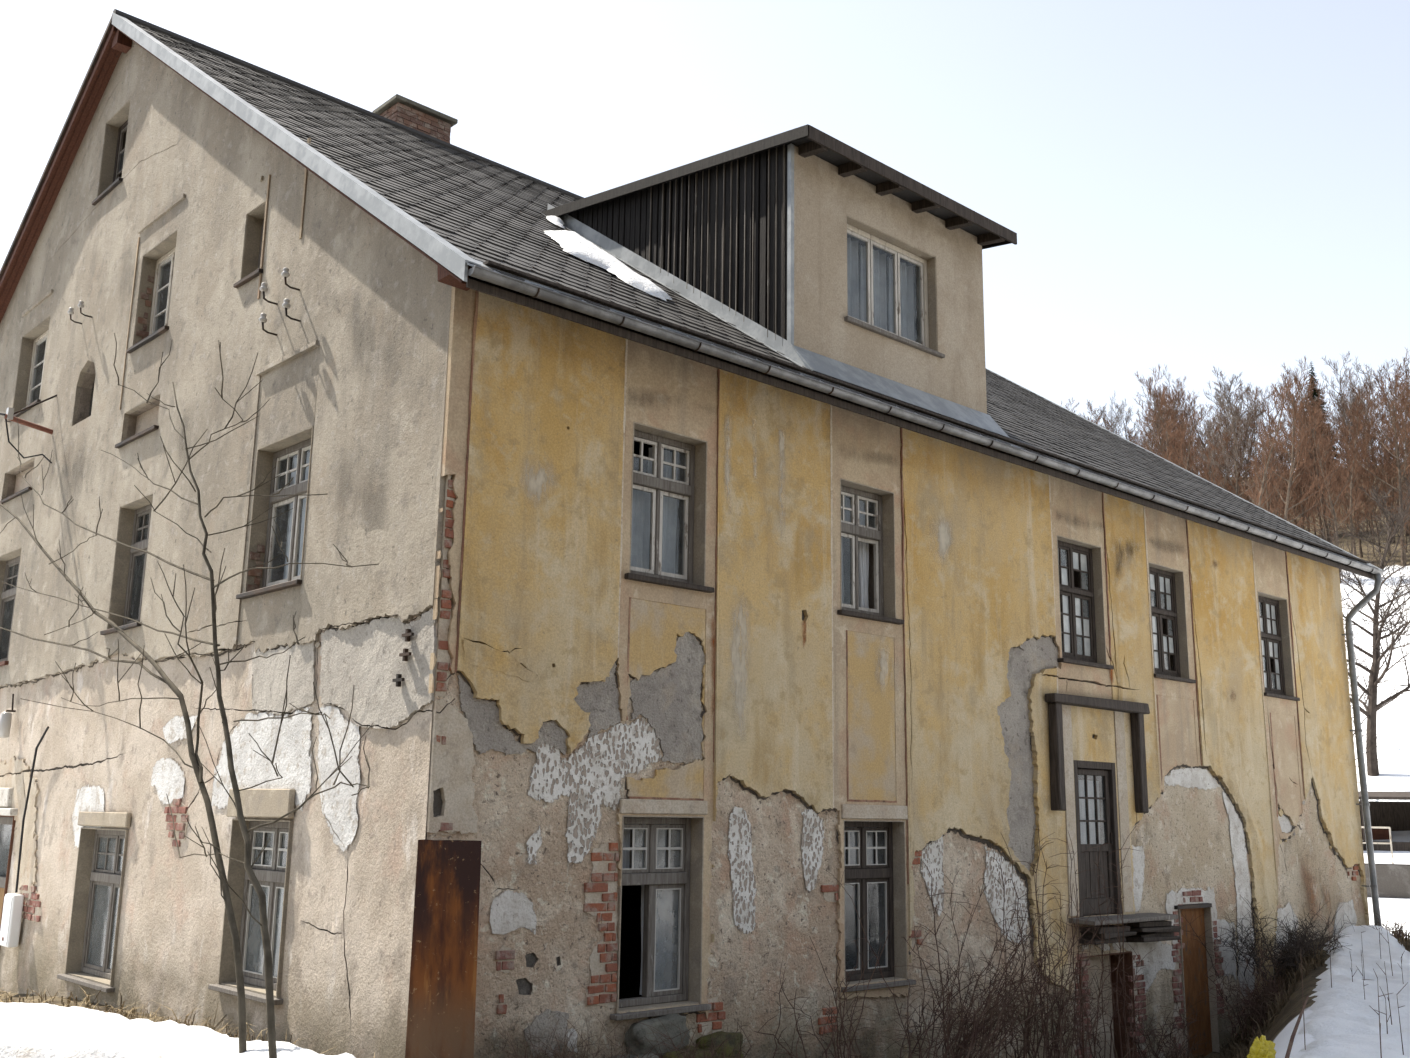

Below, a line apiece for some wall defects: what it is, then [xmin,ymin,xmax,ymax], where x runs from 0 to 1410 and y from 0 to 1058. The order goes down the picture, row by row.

crack [161,621,251,661]
crack [196,677,455,734]
flaking render [0,475,706,1058]
rust [405,839,482,1058]
flaking render [679,635,1366,1058]